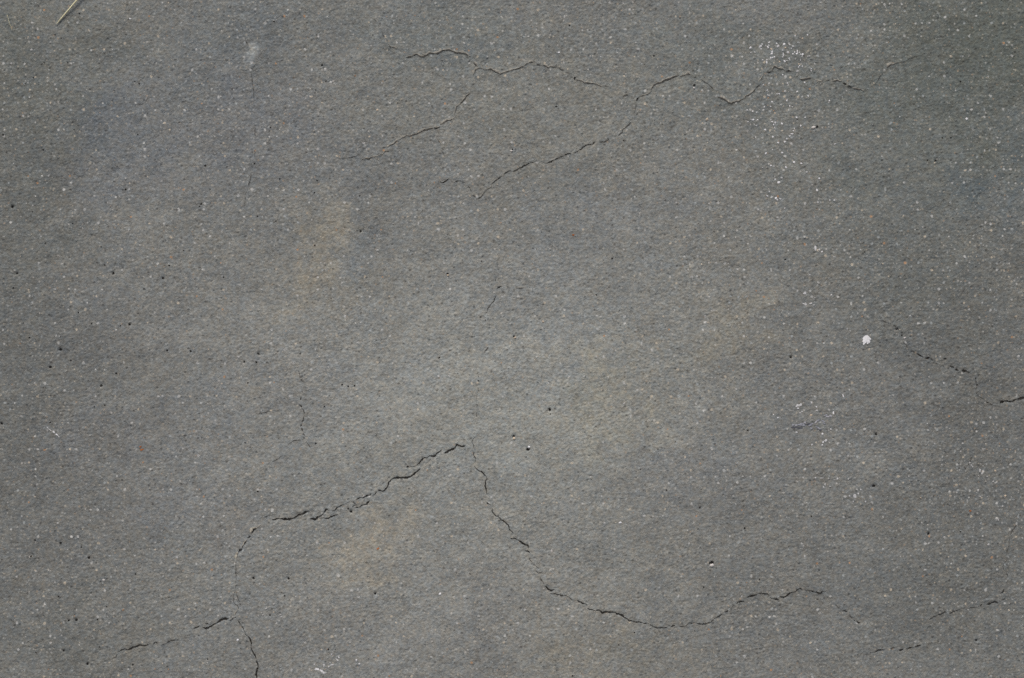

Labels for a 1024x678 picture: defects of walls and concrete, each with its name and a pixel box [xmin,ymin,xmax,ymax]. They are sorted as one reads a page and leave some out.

crack [350,19,917,199]
crack [882,320,1024,406]
crack [103,347,860,678]
crack [870,525,1017,653]